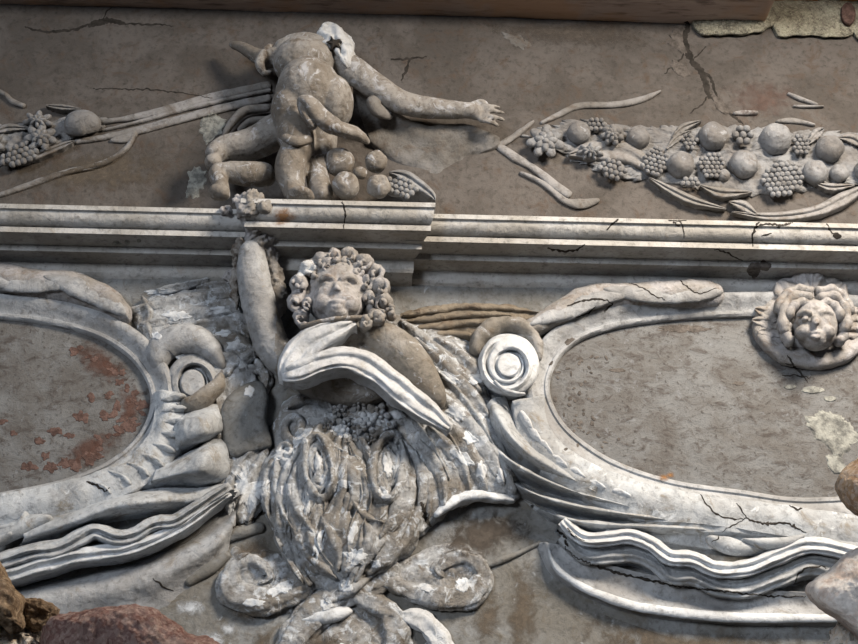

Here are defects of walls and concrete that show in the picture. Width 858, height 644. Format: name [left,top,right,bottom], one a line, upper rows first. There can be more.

crack [25,7,172,33]
crack [664,21,744,125]
crack [668,220,687,236]
crack [714,222,793,261]
crack [826,223,842,239]
crack [567,298,613,318]
crack [700,494,806,543]
leakage [450,512,530,555]
leakage [236,541,270,558]
leakage [178,602,202,612]
leakage [509,573,535,644]